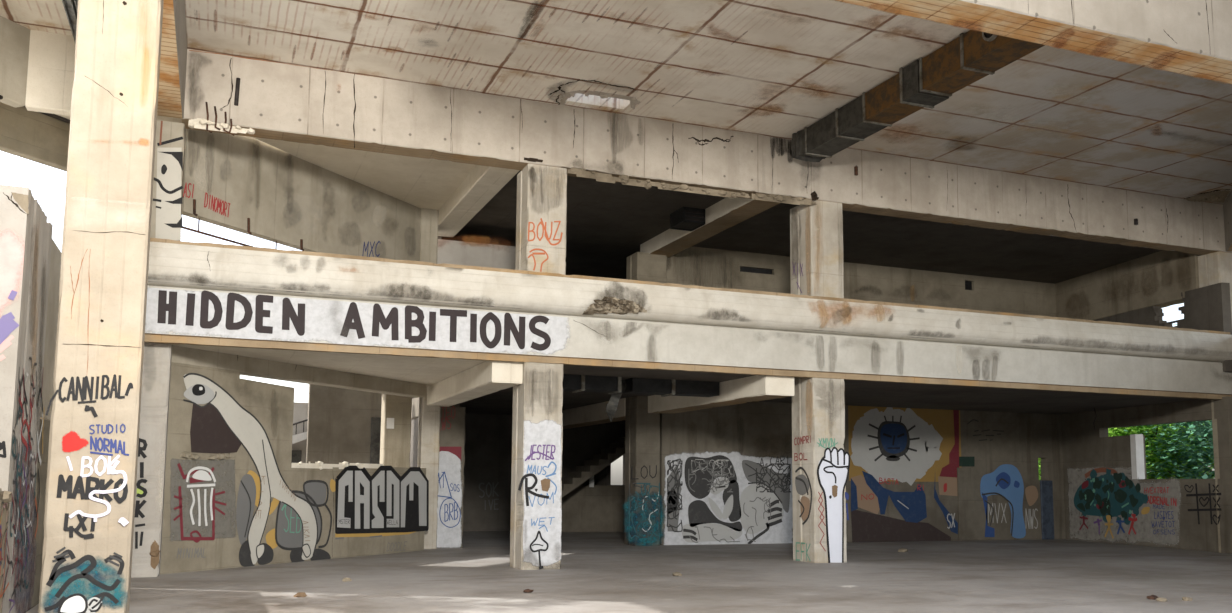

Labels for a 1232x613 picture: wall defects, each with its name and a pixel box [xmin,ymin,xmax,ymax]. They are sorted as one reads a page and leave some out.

crack [514,0,793,52]
crack [189,0,716,148]
spalling [188,102,255,136]
spalling [560,90,641,110]
crack [672,135,734,175]
spalling [582,296,647,315]